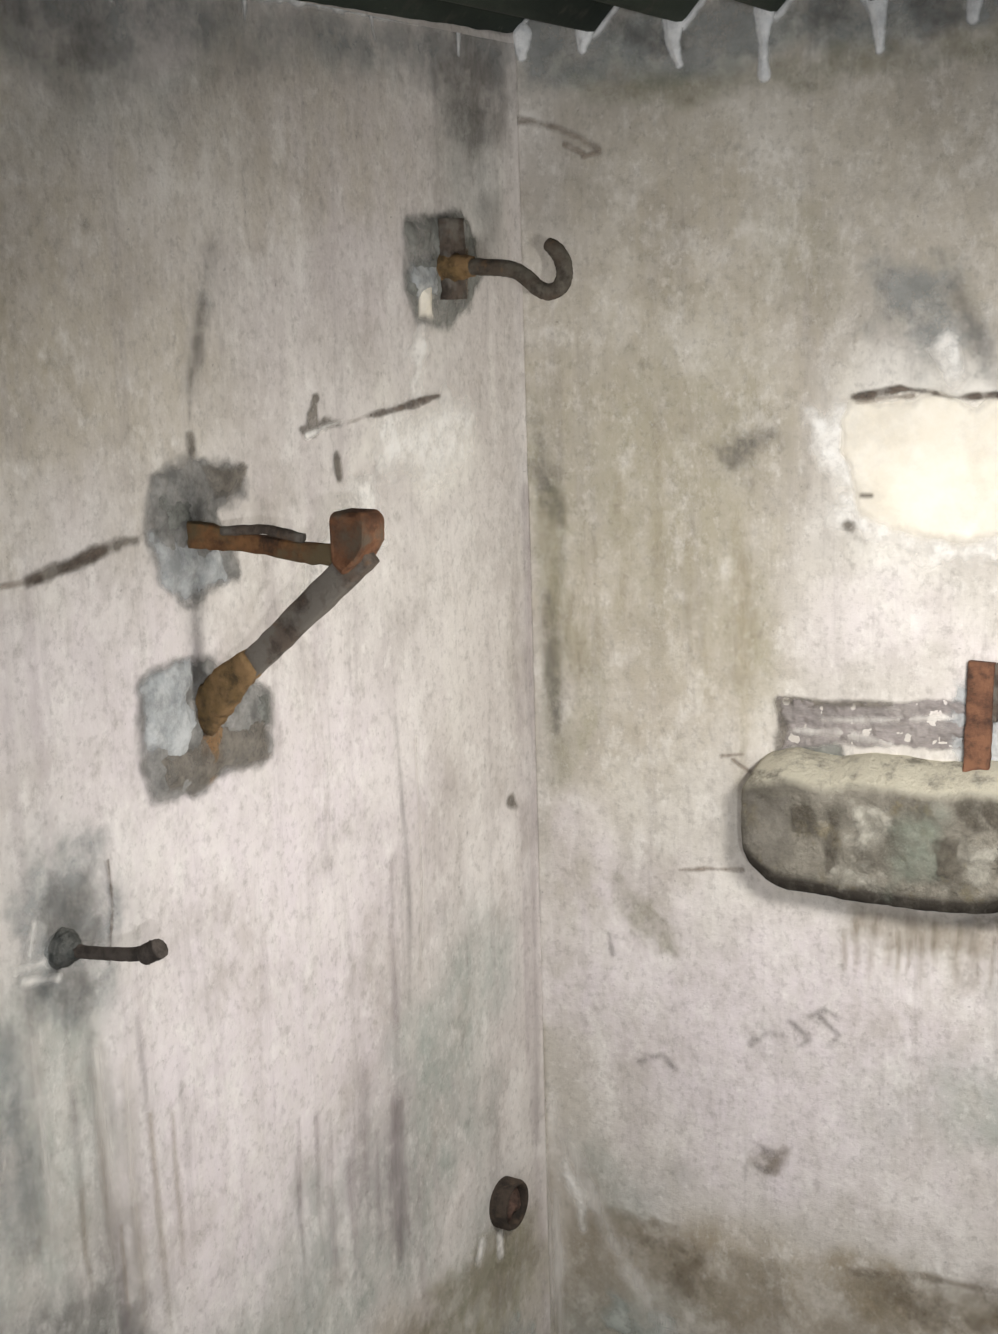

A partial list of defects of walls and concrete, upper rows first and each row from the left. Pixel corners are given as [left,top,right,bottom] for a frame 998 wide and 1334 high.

water stain [524,19,563,76]
water stain [572,6,771,71]
crack [852,386,998,403]
peeling [207,466,247,495]
peeling [806,331,998,566]
peeling [142,660,270,793]
water stain [563,1164,600,1229]
water stain [478,1231,503,1260]